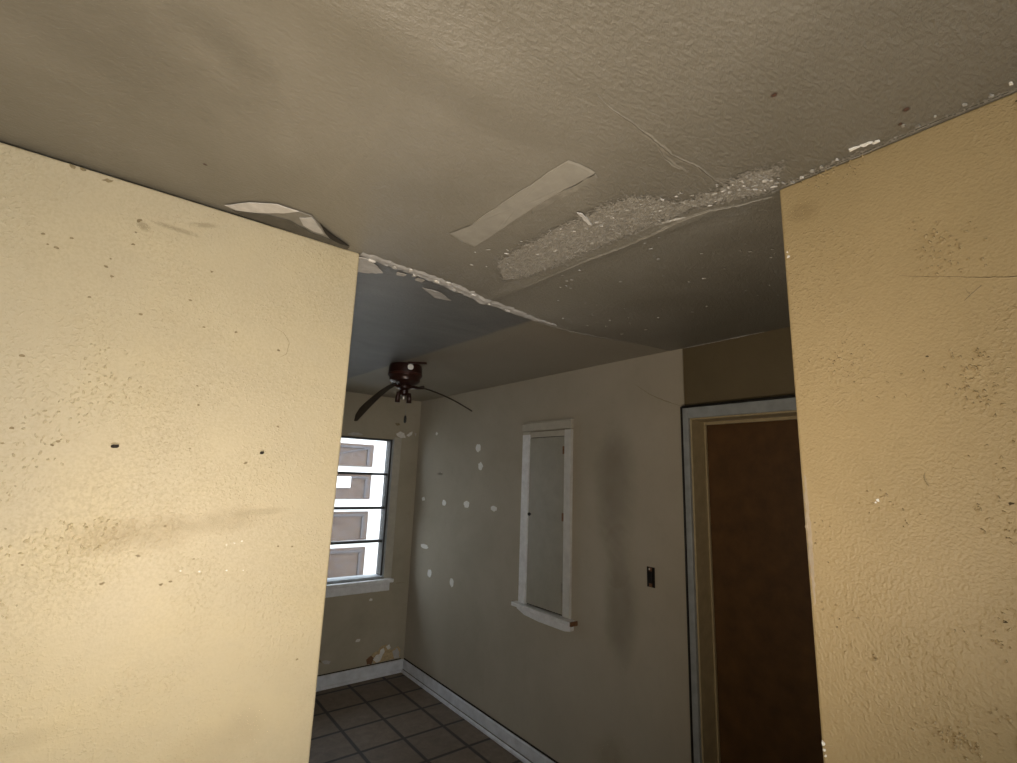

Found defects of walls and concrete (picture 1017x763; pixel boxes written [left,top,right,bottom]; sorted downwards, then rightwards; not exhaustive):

spalling [449,81,1017,282]
spalling [359,253,668,350]
crack [900,275,1017,301]